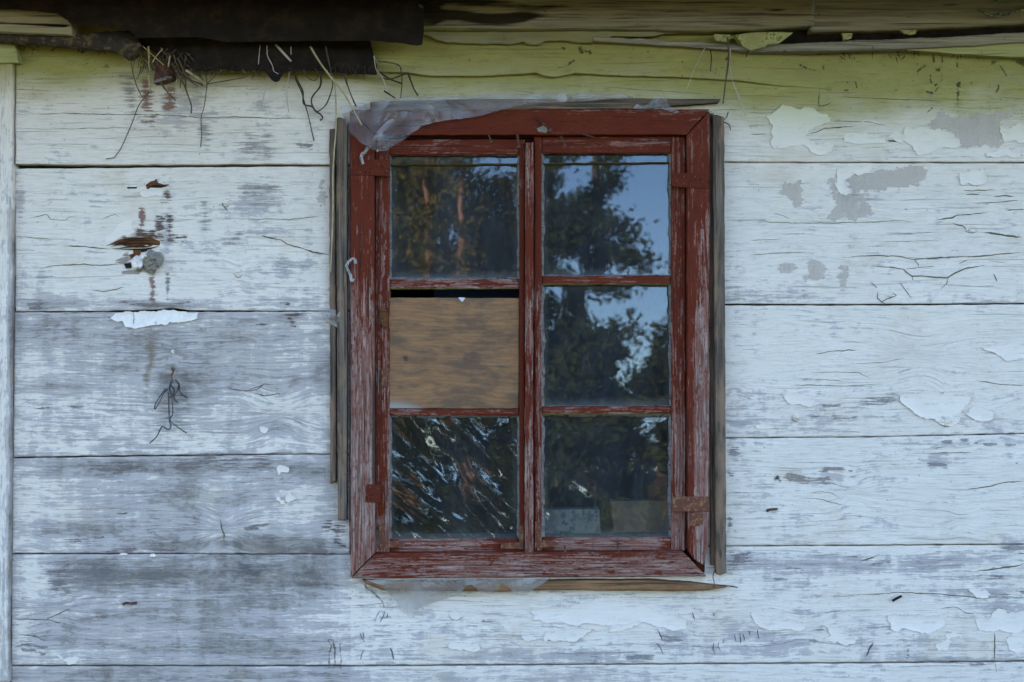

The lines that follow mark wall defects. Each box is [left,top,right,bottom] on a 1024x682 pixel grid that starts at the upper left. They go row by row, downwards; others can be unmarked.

peeling [767,105,1024,222]
crack [753,190,1023,304]
peeling [899,390,994,426]
peeling [522,596,687,642]
peeling [887,612,963,651]
peeling [976,608,1024,654]